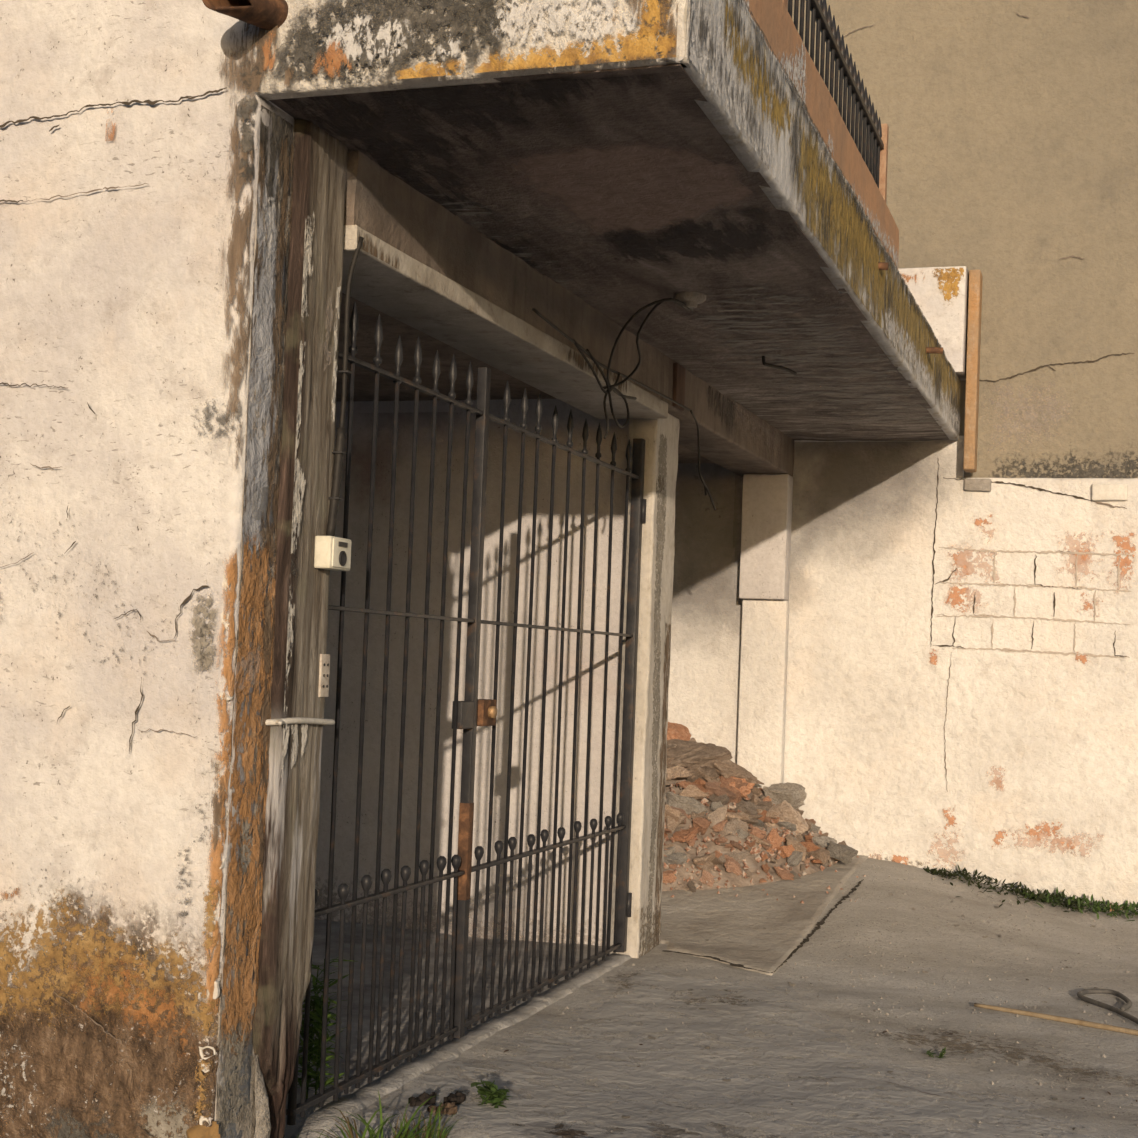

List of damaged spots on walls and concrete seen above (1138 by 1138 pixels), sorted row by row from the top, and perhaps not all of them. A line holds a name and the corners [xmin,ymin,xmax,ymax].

crack [0,87,227,131]
crack [0,183,147,203]
leakage [685,0,960,433]
leakage [194,0,511,583]
crack [0,381,65,389]
crack [979,353,1134,382]
flaking render [945,551,999,613]
flaking render [1111,533,1136,587]
crack [129,677,197,752]
flaking render [992,822,1090,855]
peeling [205,978,220,999]
leakage [0,895,223,1138]